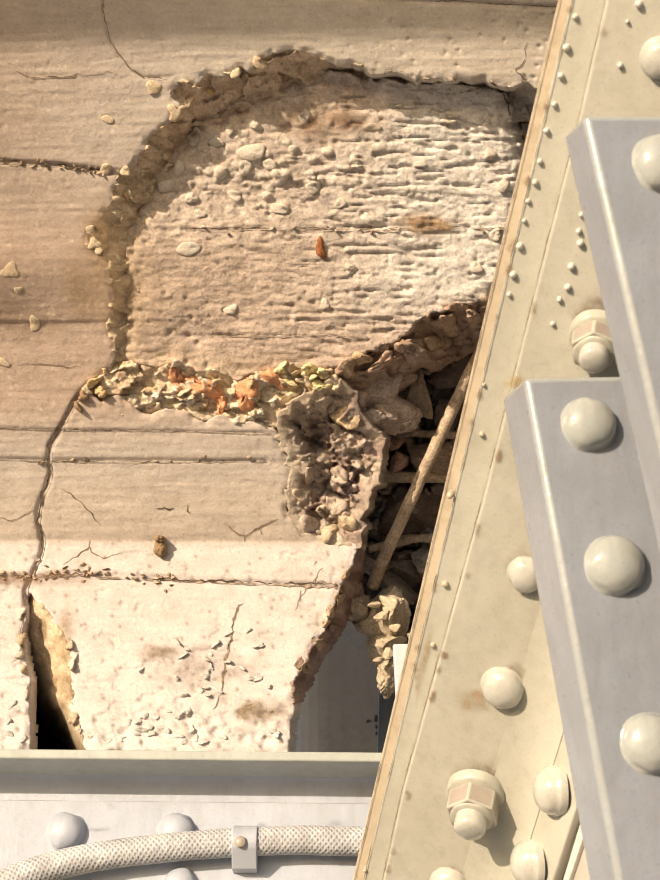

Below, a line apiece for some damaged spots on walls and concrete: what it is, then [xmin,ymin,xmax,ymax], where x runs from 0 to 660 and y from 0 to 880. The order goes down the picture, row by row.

crack [17,3,171,79]
spalling [62,50,537,704]
crack [3,363,119,750]
crack [213,604,242,709]
peeling [75,708,227,745]